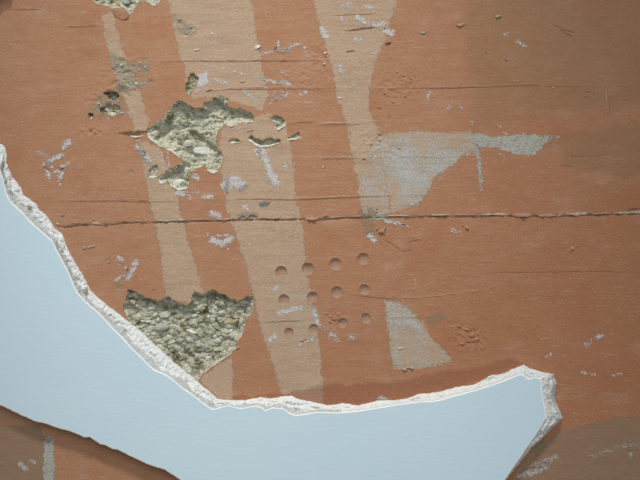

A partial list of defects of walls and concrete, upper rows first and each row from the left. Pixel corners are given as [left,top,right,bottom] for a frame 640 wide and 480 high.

spalling [101,91,121,116]
spalling [146,73,254,191]
peeling [248,133,300,148]
peeling [271,115,286,131]
crack [261,194,380,202]
crack [63,199,640,228]
spalling [0,144,563,480]